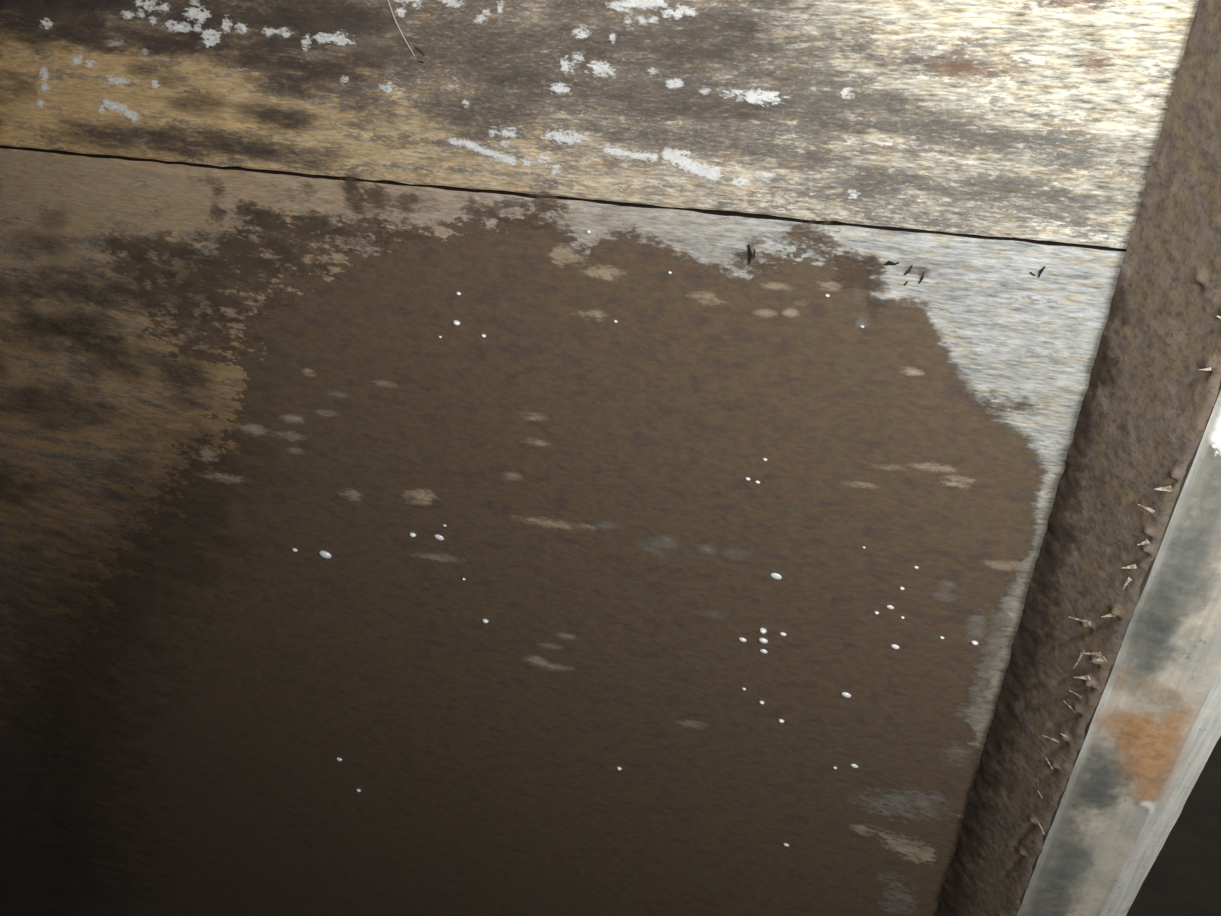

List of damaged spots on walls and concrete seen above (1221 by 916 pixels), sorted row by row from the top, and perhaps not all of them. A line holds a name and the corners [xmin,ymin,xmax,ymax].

leakage [0,0,387,94]
leakage [74,125,278,158]
leakage [252,110,310,128]
leakage [343,174,387,214]
crack [747,244,756,264]
leakage [956,0,1221,916]
leakage [13,192,1117,916]
corrosion [1118,714,1184,801]